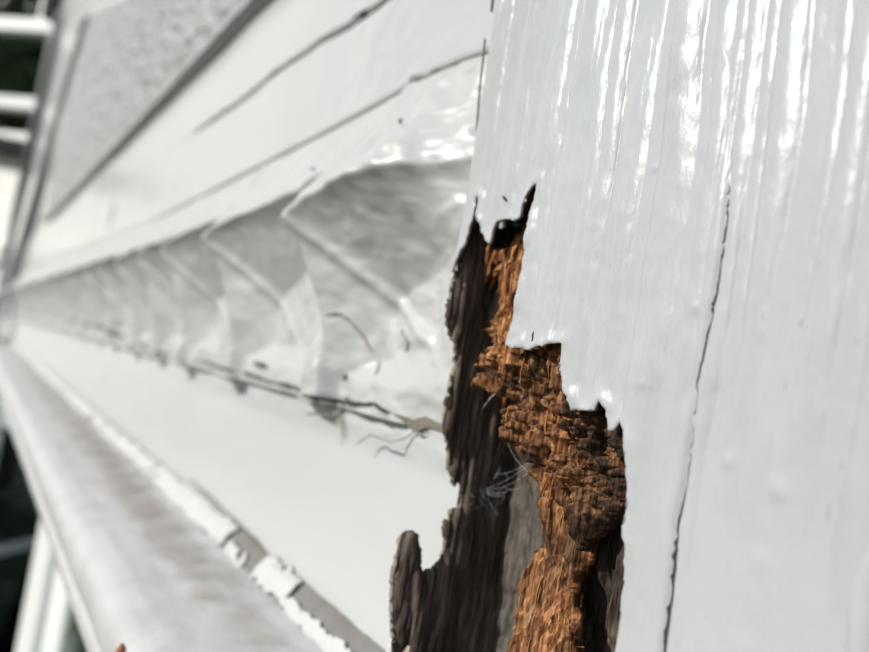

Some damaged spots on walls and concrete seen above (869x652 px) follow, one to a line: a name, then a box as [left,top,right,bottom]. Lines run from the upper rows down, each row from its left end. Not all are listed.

crack [663,149,732,652]